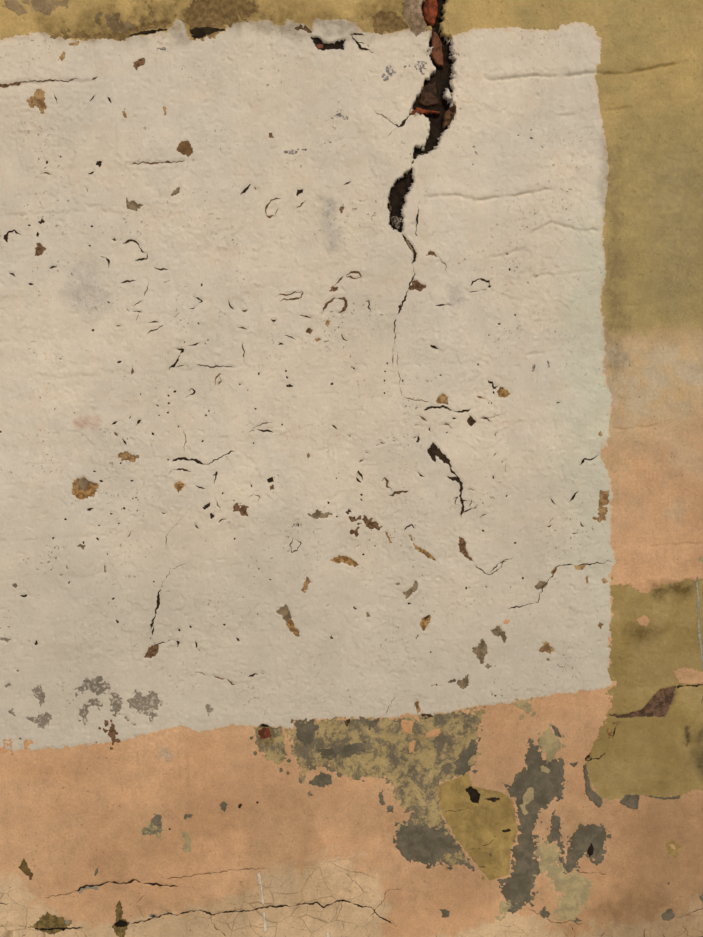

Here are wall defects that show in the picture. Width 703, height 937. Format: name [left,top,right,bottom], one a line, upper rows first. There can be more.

flaking render [50,13,172,61]
flaking render [183,0,259,41]
crack [374,108,411,136]
crack [279,271,372,318]
crack [392,270,498,418]
crack [447,467,477,518]
peeling [250,576,703,925]
crack [44,866,400,937]